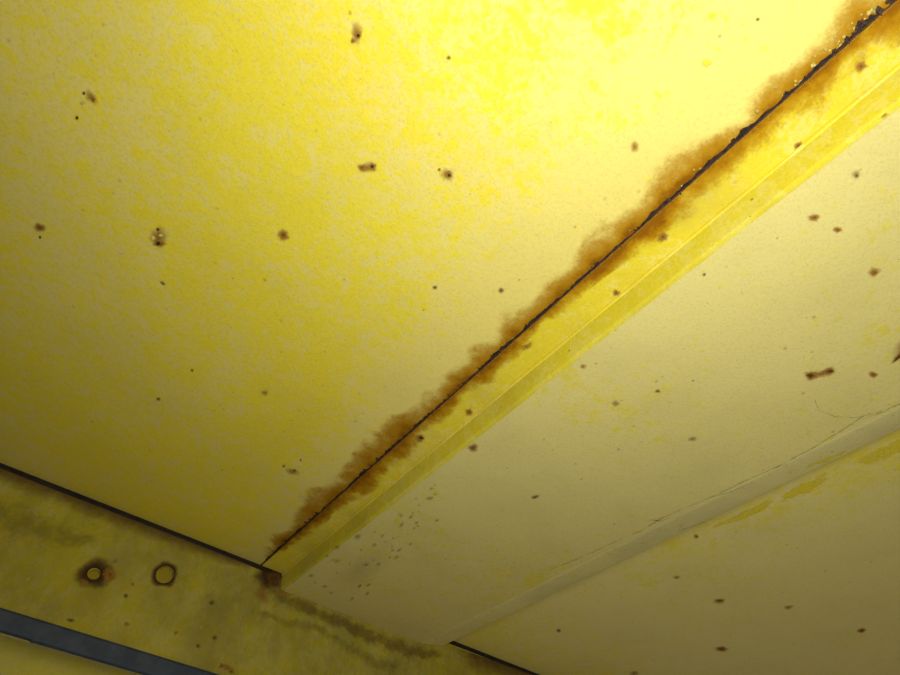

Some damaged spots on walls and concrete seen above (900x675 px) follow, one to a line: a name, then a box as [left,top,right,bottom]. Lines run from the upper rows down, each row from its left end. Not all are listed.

corrosion [151,228,164,246]
corrosion [256,0,900,600]
corrosion [77,560,115,587]